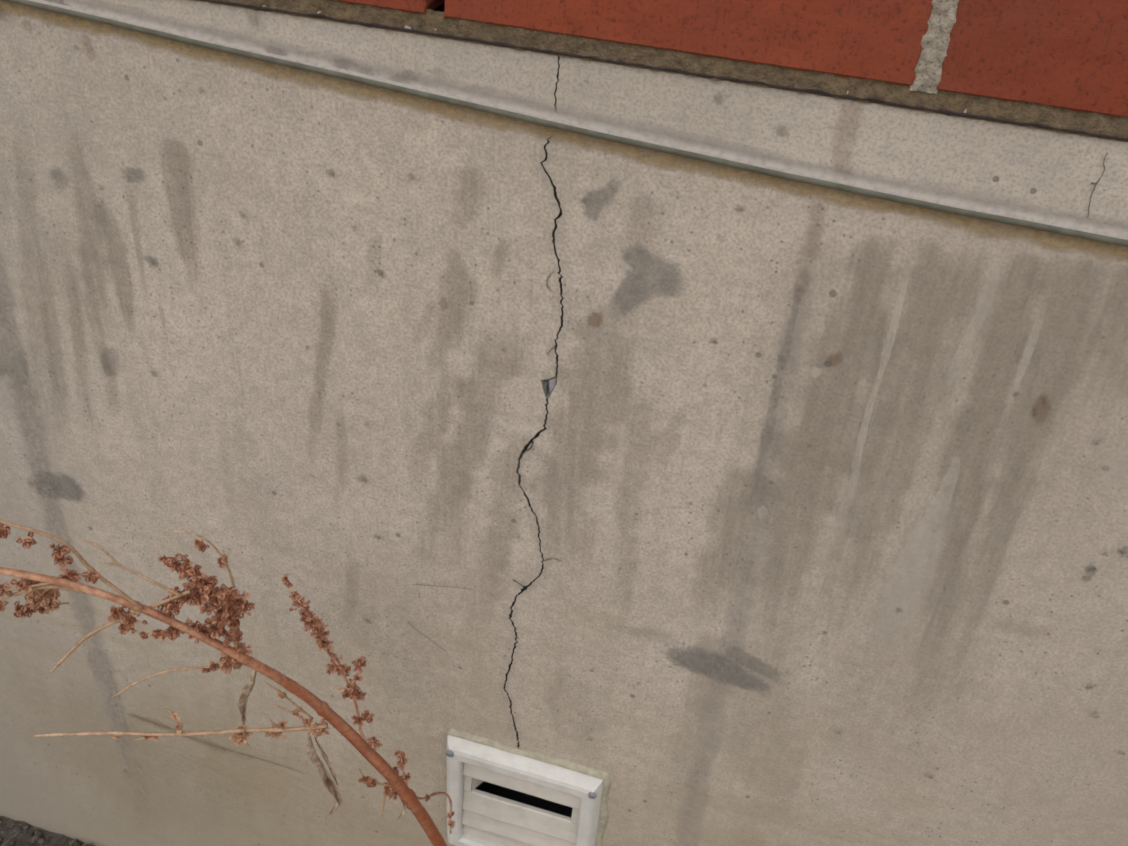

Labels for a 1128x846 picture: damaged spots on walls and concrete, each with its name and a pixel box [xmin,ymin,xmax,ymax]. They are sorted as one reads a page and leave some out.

crack [503,56,564,748]